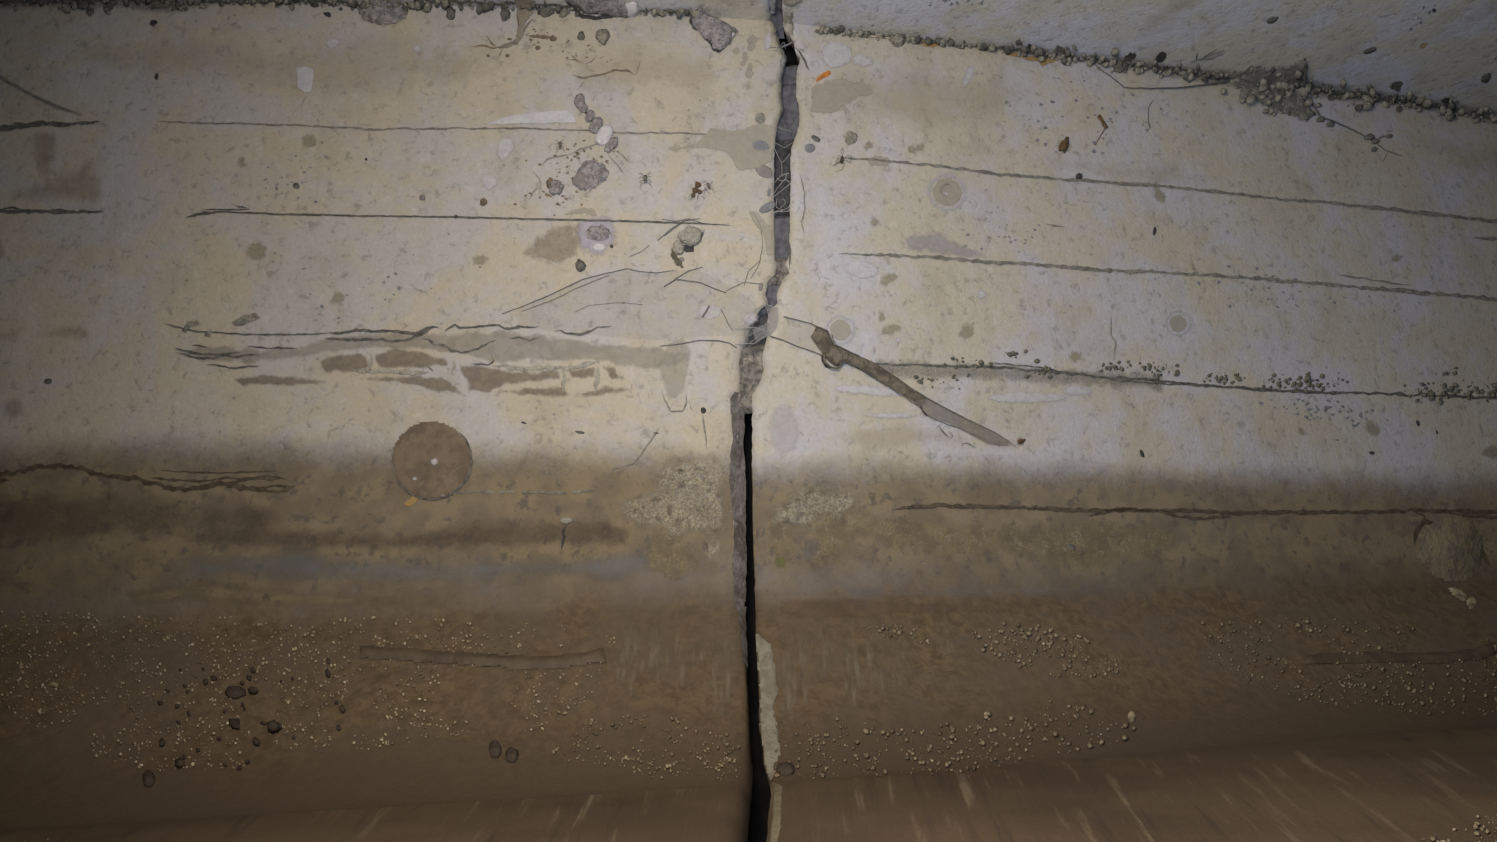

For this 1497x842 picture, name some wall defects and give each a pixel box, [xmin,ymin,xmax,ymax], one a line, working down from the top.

crack [789,176,806,269]
crack [844,157,1497,223]
crack [841,253,1497,302]
crack [164,323,325,336]
spalling [237,350,622,395]
crack [876,314,1497,405]
crack [0,463,295,493]
damp [0,452,734,599]
damp [752,474,1497,579]
crack [893,502,1497,520]